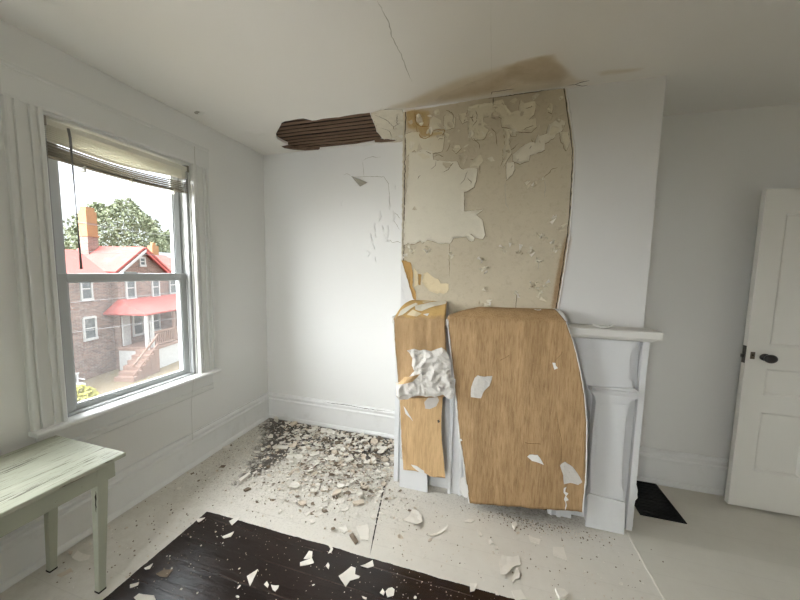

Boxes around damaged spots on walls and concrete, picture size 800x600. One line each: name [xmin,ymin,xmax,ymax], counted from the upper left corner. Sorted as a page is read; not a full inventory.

flaking render [275,112,378,152]
flaking render [401,89,574,315]